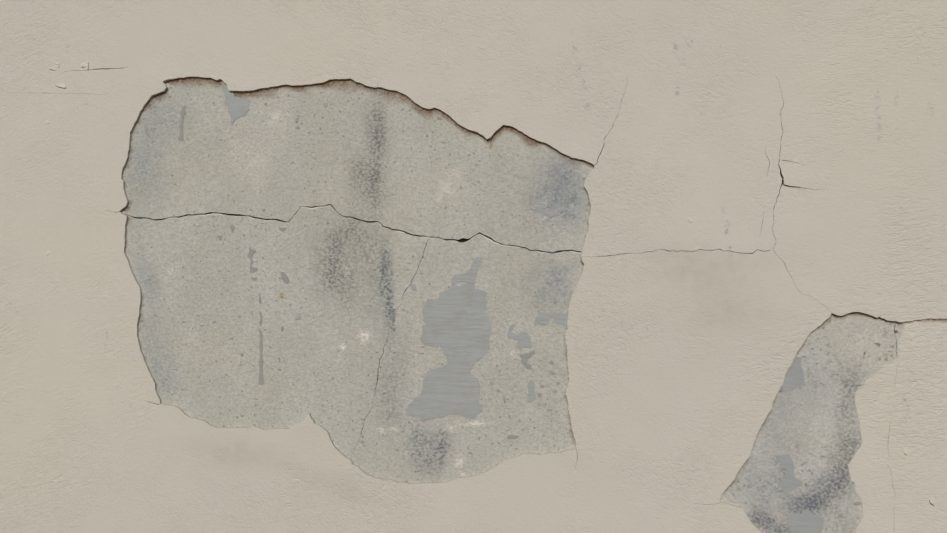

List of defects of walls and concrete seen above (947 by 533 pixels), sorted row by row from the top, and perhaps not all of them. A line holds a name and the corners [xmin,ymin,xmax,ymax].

peeling [119,76,594,484]
crack [107,77,832,457]
peeling [719,312,947,533]